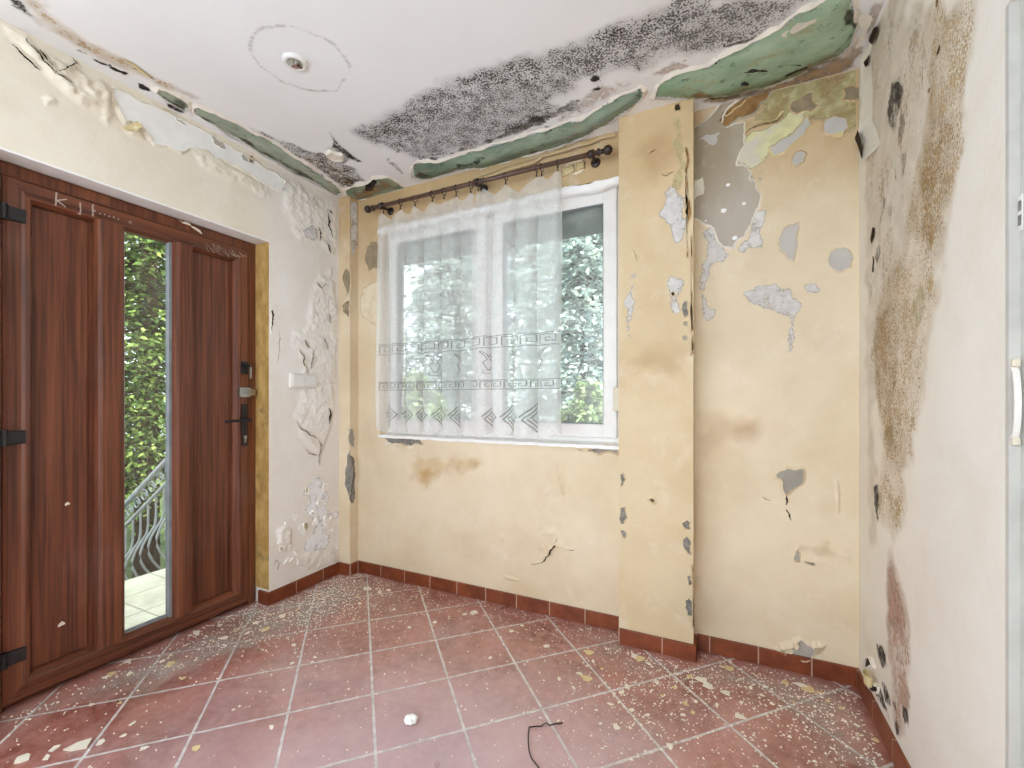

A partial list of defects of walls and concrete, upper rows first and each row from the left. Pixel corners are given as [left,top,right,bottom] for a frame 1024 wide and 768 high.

water stain [844,6,892,29]
water stain [354,0,803,166]
peeling [659,27,880,321]
water stain [871,1,973,528]
peeling [744,284,801,351]
peeling [277,477,339,573]
spalling [345,428,356,504]
crack [531,538,574,565]
peeling [774,466,806,519]
peeling [775,636,827,663]
water stain [876,560,910,735]